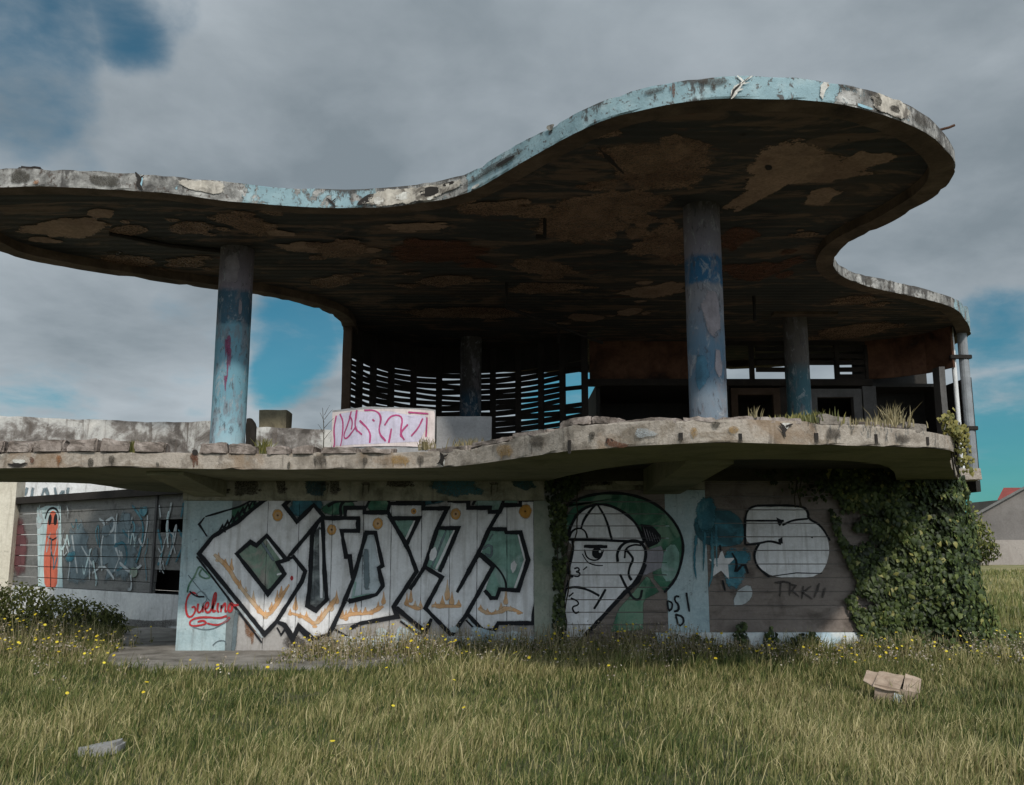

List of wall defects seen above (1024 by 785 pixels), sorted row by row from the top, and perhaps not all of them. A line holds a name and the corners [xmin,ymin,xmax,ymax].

peeling [858,93,930,127]
peeling [15,208,148,243]
peeling [165,210,387,289]
peeling [357,150,684,266]
peeling [722,138,897,212]
peeling [696,290,722,390]